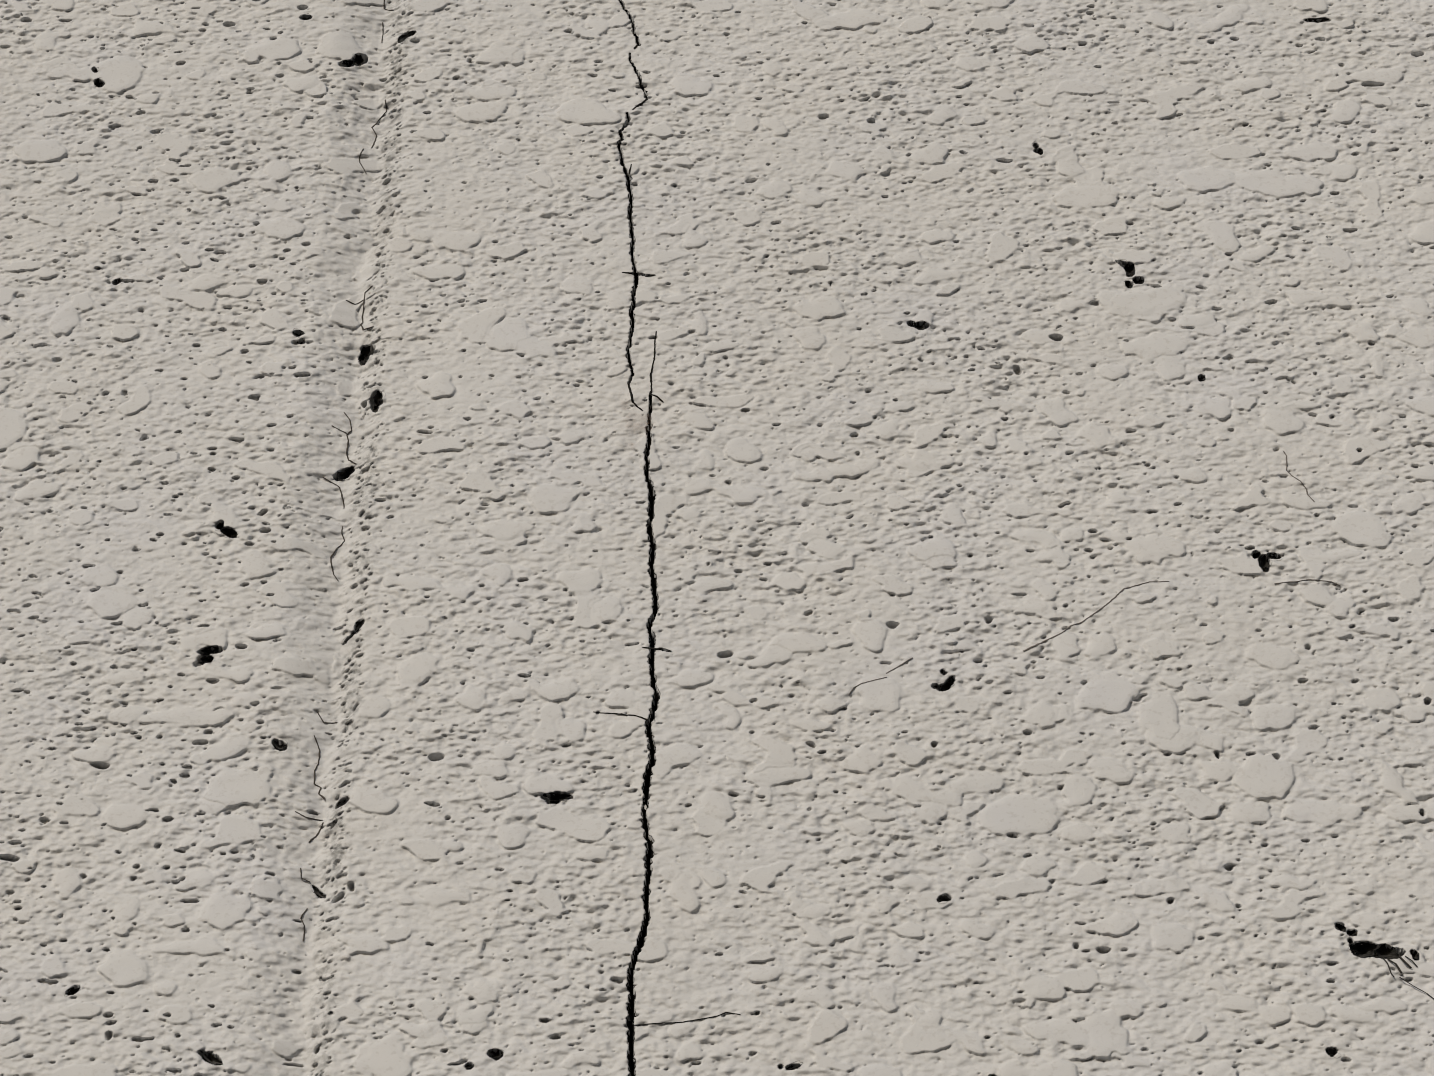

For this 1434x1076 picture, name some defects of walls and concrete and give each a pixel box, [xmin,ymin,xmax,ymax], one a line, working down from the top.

crack [593,0,741,1076]